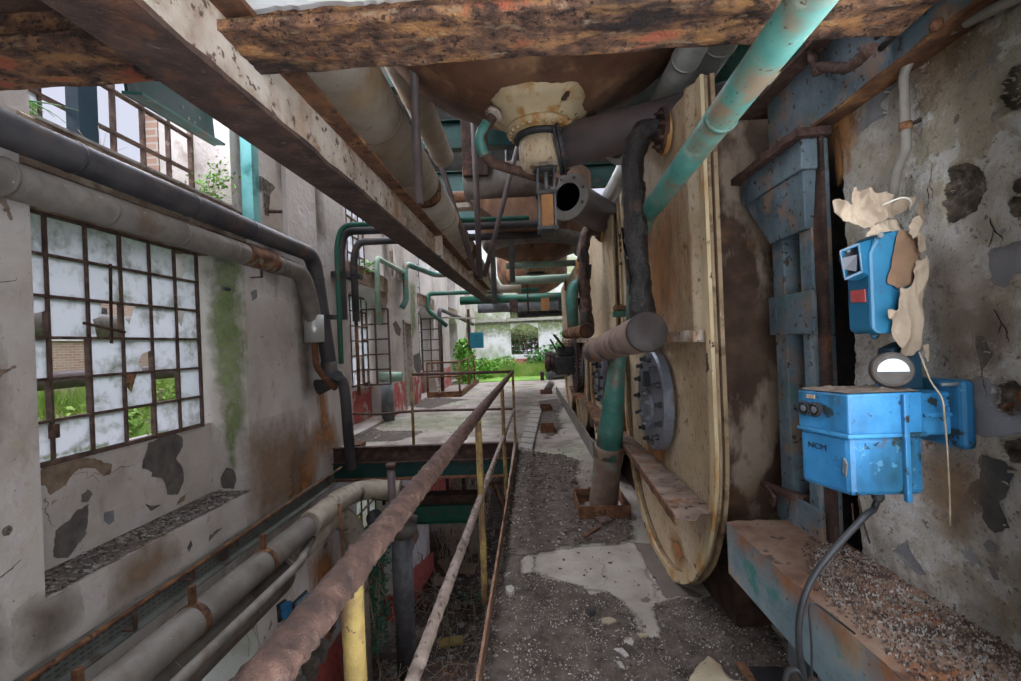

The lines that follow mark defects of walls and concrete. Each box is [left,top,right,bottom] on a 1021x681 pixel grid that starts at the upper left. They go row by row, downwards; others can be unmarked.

spalling [942,163,987,223]
flaking render [988,241,1021,288]
flaking render [40,434,250,596]
flaking render [967,336,1021,554]